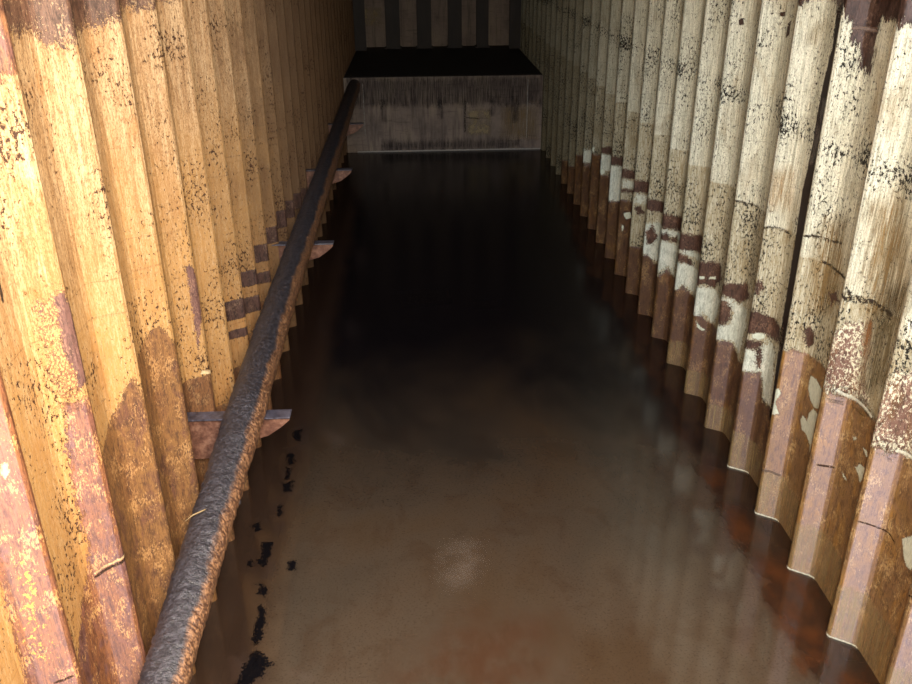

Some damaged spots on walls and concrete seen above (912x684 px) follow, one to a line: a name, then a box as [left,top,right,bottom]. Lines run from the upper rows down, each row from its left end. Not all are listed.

corrosion [0,0,178,87]
peeling [561,147,912,684]